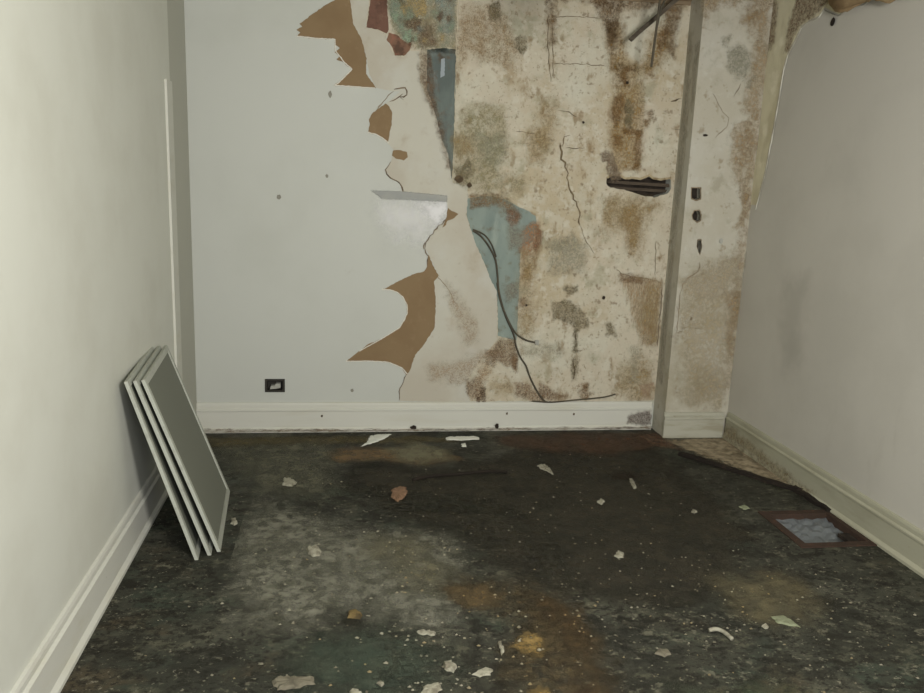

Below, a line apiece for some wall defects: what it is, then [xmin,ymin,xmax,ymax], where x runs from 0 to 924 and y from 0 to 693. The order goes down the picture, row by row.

damp [447,105,522,189]
damp [460,2,527,63]
flaking render [297,0,691,402]
crack [547,16,604,76]
crack [558,110,594,253]
damp [590,0,681,56]
spalling [691,187,702,223]
damp [705,0,768,178]
flaking render [751,0,844,210]
damp [467,341,518,402]
damp [552,286,588,375]
crack [616,242,700,346]